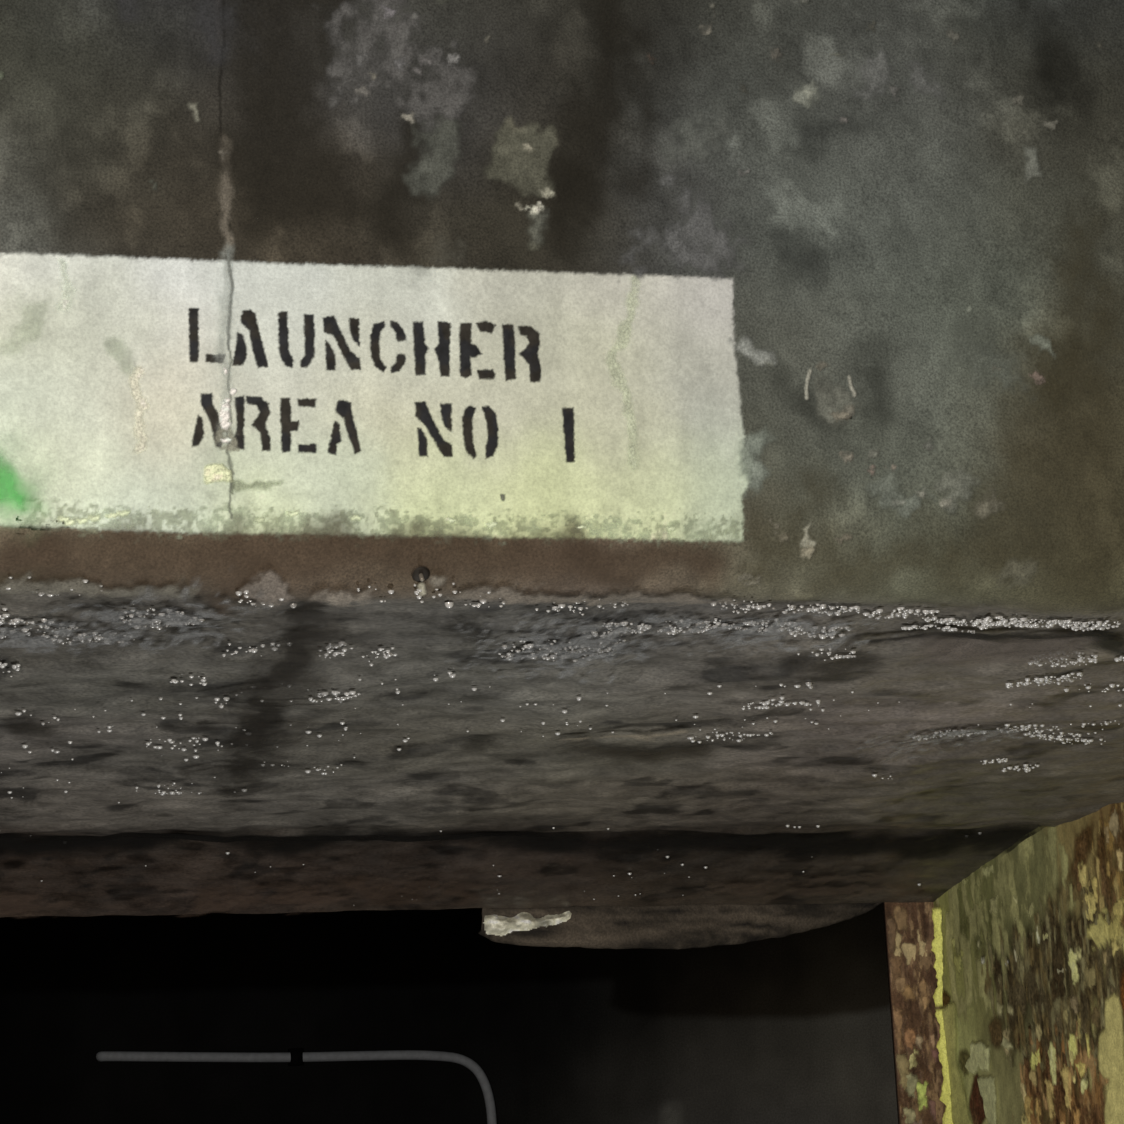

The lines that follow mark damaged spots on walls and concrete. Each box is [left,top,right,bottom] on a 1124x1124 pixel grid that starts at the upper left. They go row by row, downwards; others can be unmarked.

peeling [326,0,475,194]
peeling [488,119,557,250]
crack [215,136,239,518]
leakage [0,578,242,653]
leakage [241,571,292,608]
leakage [312,591,370,607]
leakage [457,587,869,683]
leakage [858,729,1035,758]
leakage [0,830,1036,859]
peeling [887,826,1075,1124]
peeling [1098,994,1124,1124]